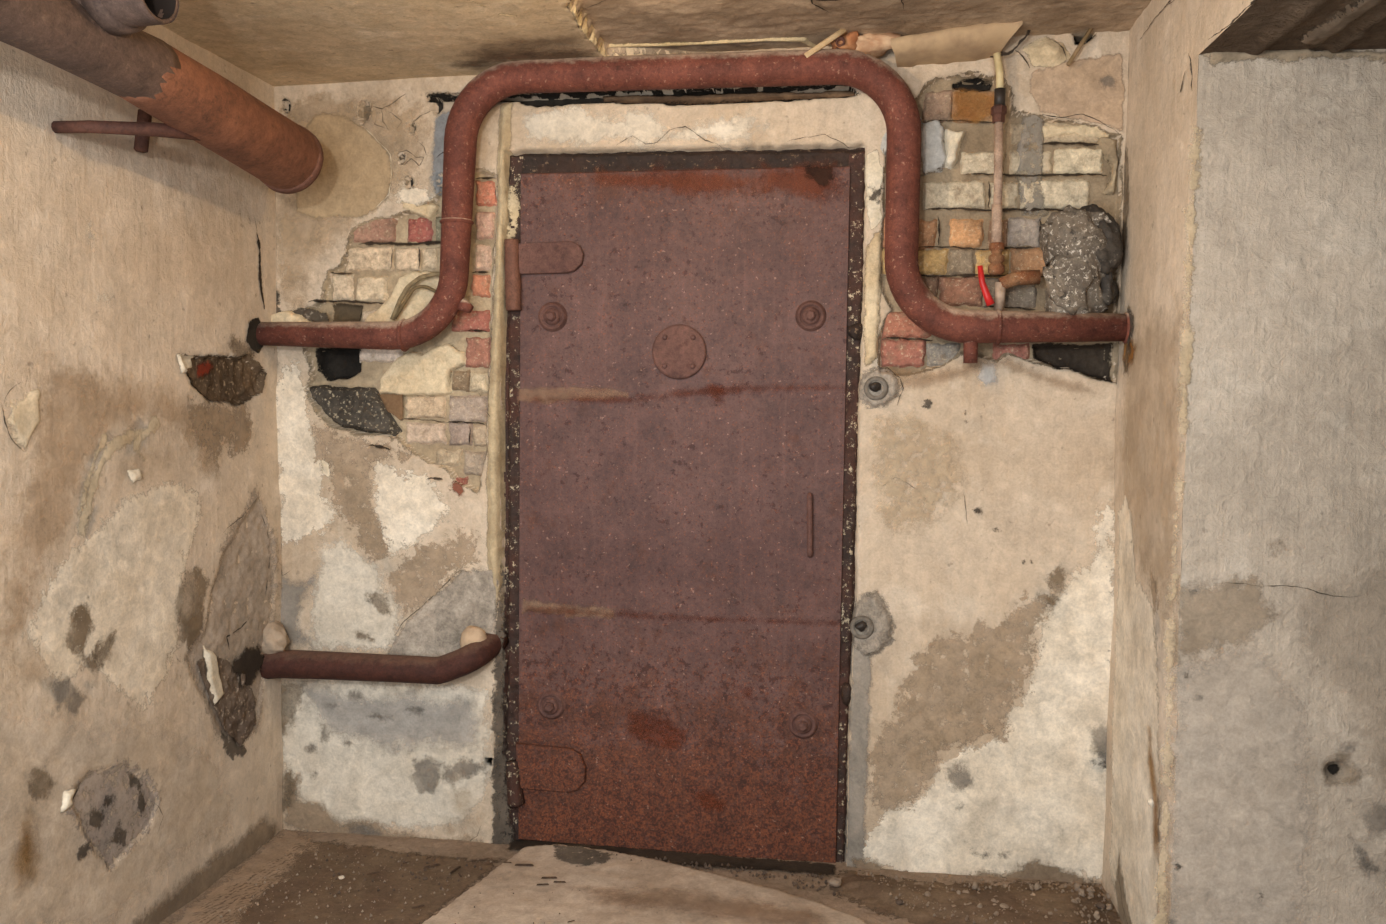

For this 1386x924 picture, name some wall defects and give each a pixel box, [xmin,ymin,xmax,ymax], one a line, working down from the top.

spalling [567,3,816,57]
spalling [865,71,1134,384]
spalling [22,154,521,760]
leakage [1178,578,1271,658]
spalling [60,758,163,871]
peeling [281,680,493,830]
leakage [845,566,1064,870]
leakage [976,853,1093,884]
leakage [1095,737,1107,764]
corrosion [1147,760,1157,845]